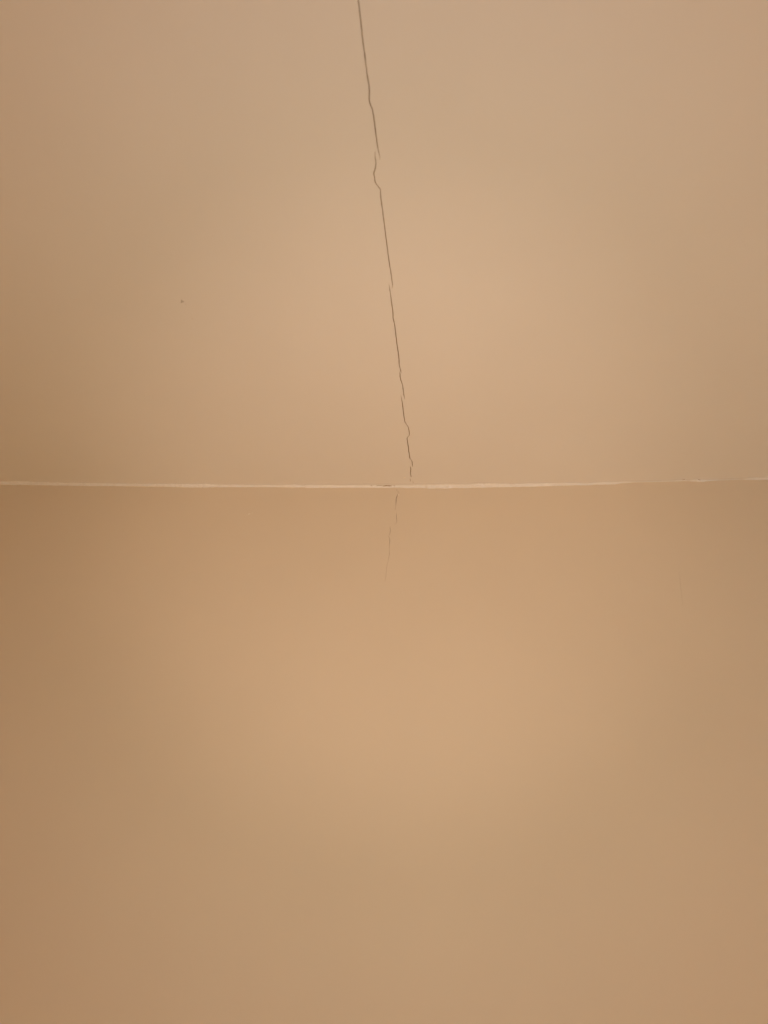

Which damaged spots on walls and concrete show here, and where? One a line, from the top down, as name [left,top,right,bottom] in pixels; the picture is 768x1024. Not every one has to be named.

crack [358,0,413,571]